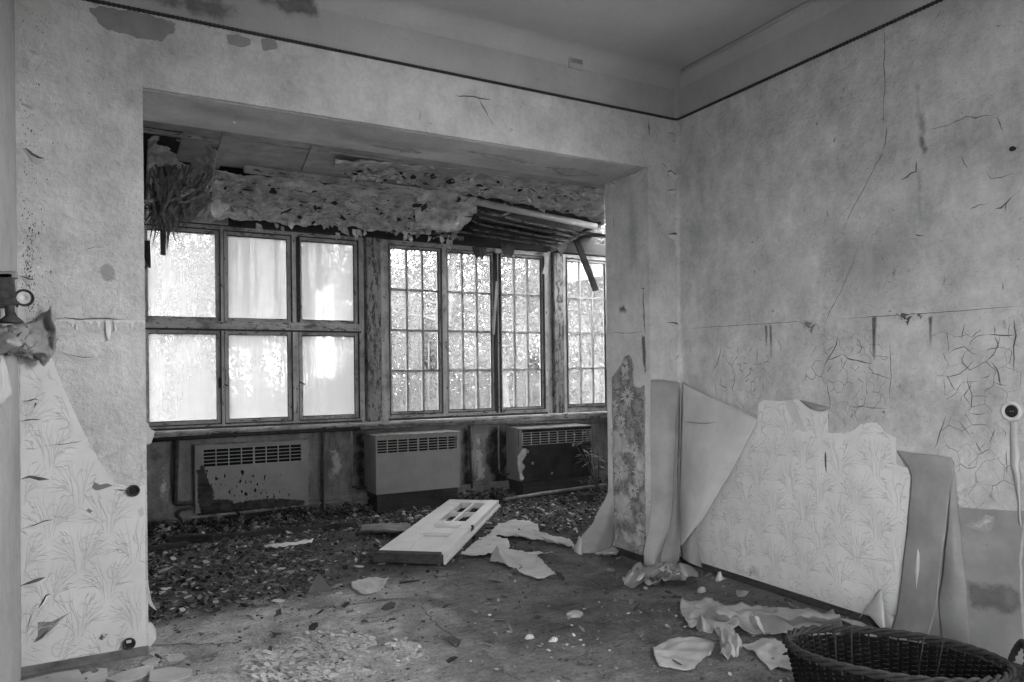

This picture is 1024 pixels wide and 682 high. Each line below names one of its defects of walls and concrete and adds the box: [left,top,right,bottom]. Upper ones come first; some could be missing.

peeling [90,6,175,41]
crack [438,87,493,124]
crack [927,115,1003,131]
peeling [213,167,603,241]
crack [962,156,1014,211]
crack [714,33,891,432]
crack [927,311,1024,508]
damp [969,584,1020,613]